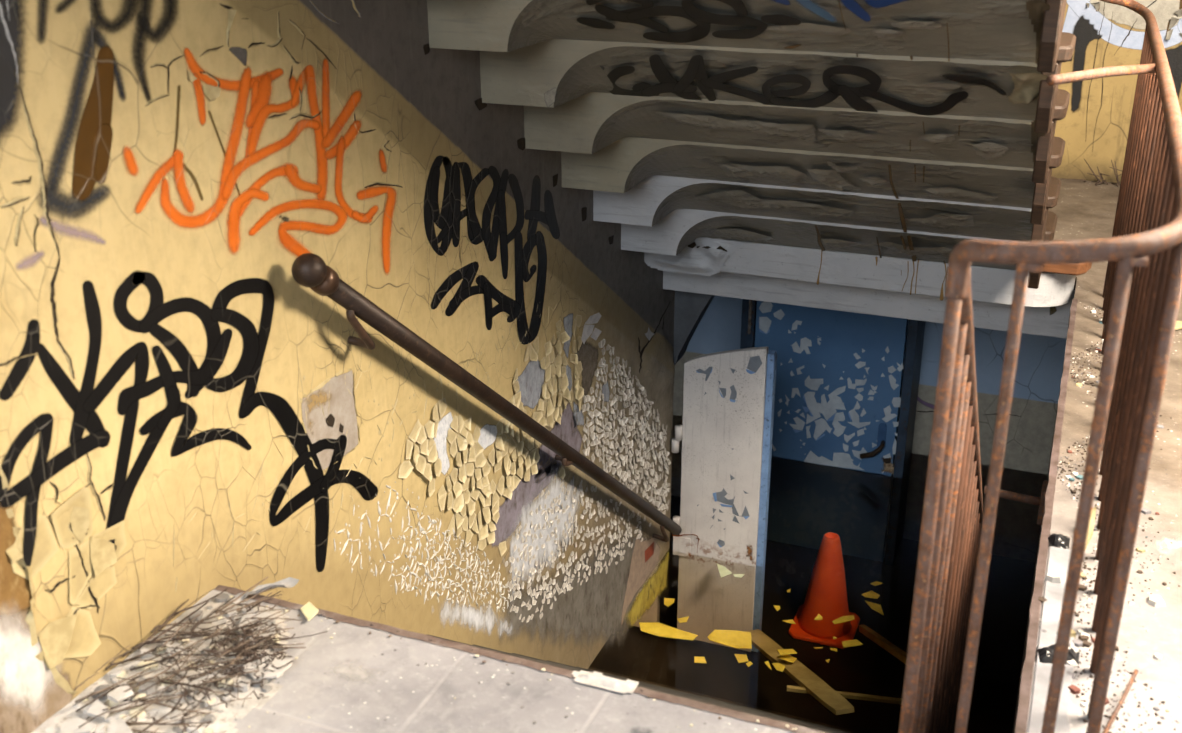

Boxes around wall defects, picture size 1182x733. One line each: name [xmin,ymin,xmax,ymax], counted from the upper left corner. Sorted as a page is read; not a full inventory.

crack [0,0,75,379]
crack [145,0,361,120]
crack [353,113,392,152]
crack [364,181,403,189]
peeling [495,304,671,515]
crack [638,301,671,373]
peeling [759,302,904,470]
spalling [0,487,127,733]
crack [45,453,117,615]
peeling [299,361,660,625]
peeling [639,616,797,672]
peeling [711,475,749,547]